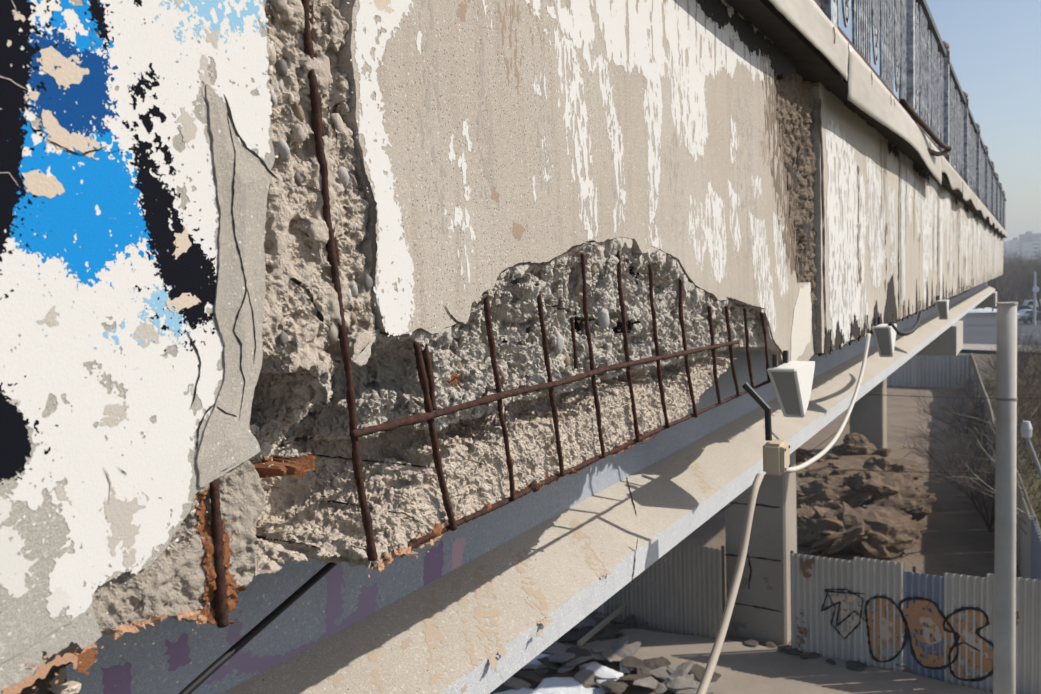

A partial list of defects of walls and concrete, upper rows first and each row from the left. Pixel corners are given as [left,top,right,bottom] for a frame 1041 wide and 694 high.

crack [185,94,279,459]
spalling [12,0,817,592]
peeling [824,119,1003,358]
peeling [0,212,224,639]
rust [2,487,246,694]
rust [249,442,316,489]
rust [368,503,492,577]
rust [514,455,599,498]